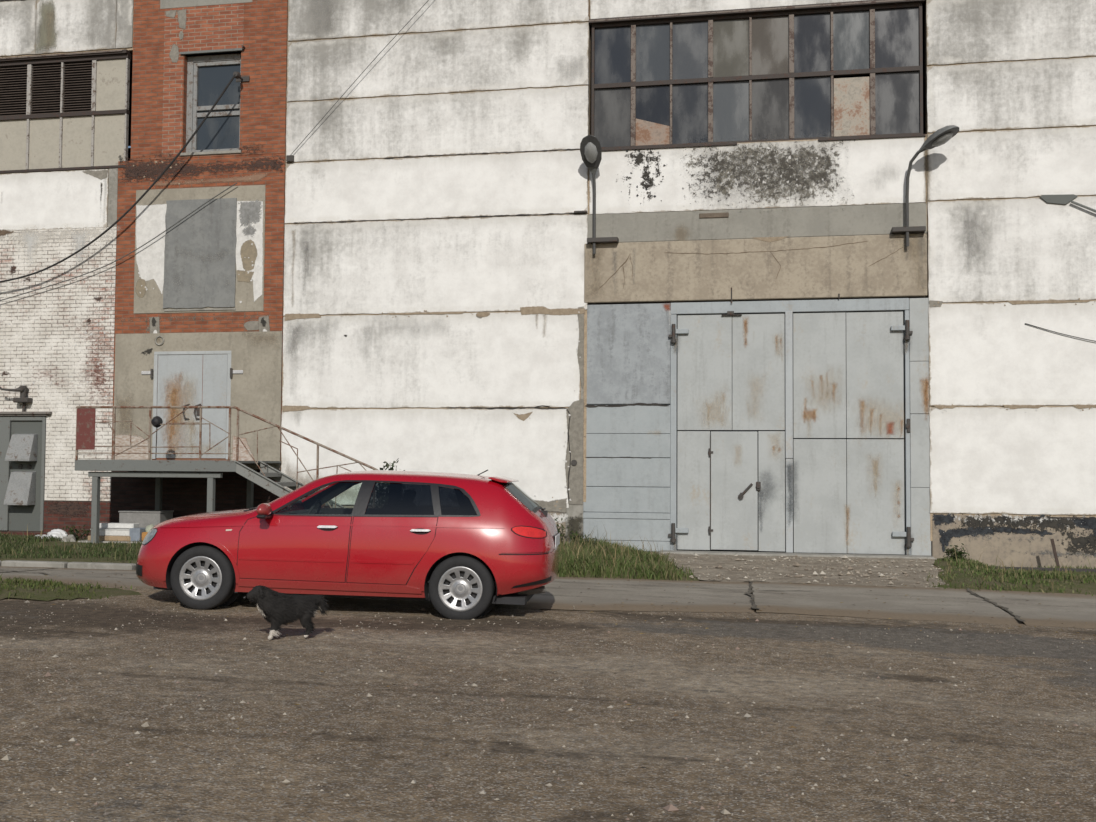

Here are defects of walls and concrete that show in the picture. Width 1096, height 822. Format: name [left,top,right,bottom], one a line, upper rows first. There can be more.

leakage [616,145,665,204]
flaking render [237,240,257,282]
peeling [949,513,1094,541]